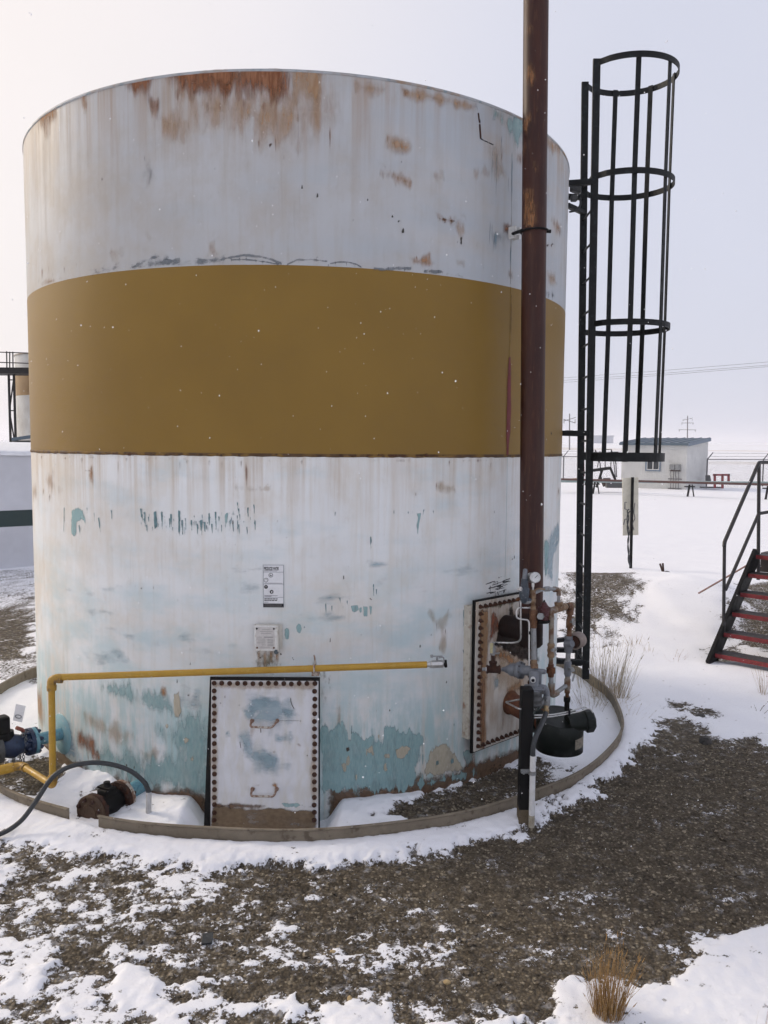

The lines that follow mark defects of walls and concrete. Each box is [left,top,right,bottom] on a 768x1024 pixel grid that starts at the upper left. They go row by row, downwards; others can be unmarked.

rust [131,80,151,93]
rust [177,71,319,131]
crack [478,113,494,145]
peeling [71,508,85,536]
peeling [140,502,256,534]
rust [329,603,518,809]
peeling [99,681,207,794]
peeling [320,721,475,795]